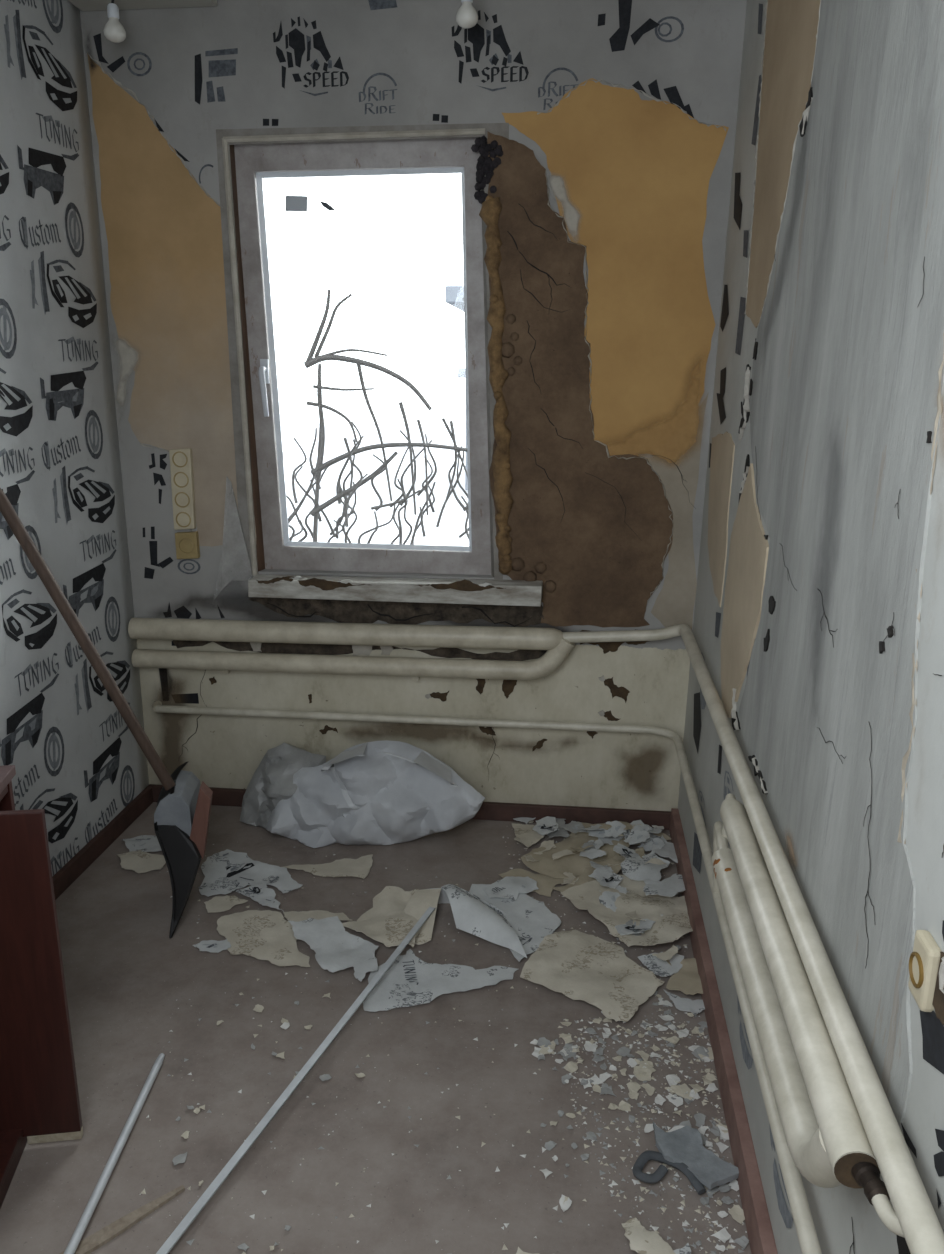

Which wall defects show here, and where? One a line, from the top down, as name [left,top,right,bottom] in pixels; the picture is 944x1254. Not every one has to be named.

flaking render [639,392,709,630]
flaking render [249,576,544,627]
flaking render [173,640,547,661]
spalling [580,629,649,654]
spalling [425,691,449,702]
spalling [476,679,486,695]
spalling [502,680,517,698]
spalling [598,675,630,721]
damp [627,750,662,791]
crack [819,723,875,969]